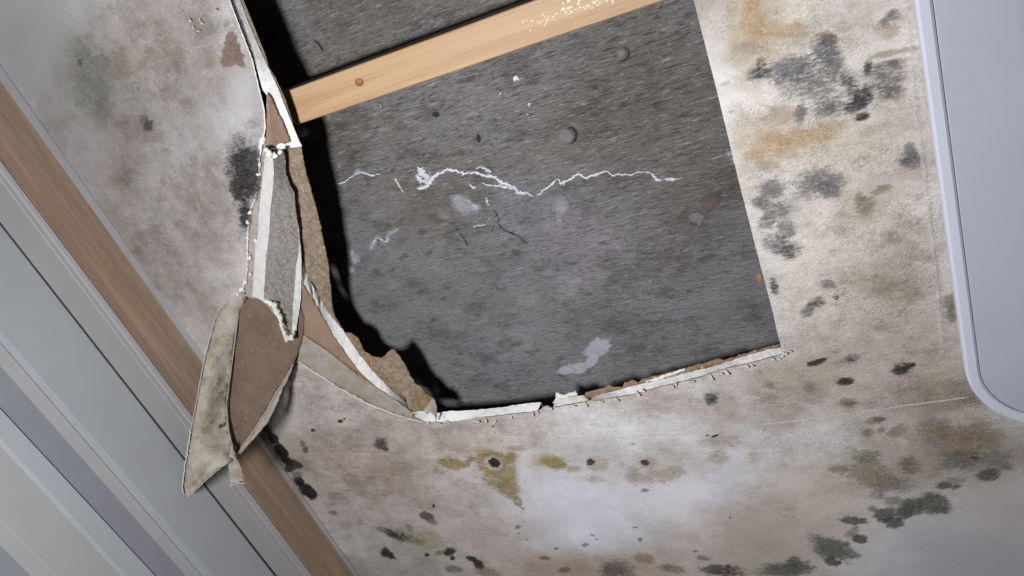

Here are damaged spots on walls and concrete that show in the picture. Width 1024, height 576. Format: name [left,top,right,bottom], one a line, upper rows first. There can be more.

damp [225,138,261,228]
crack [338,164,682,251]
damp [726,0,916,259]
damp [901,144,922,167]
peeling [296,335,451,426]
damp [263,425,317,500]
damp [438,446,524,509]
damp [533,456,606,478]
damp [621,458,683,492]
damp [761,417,1010,576]
damp [377,504,495,576]